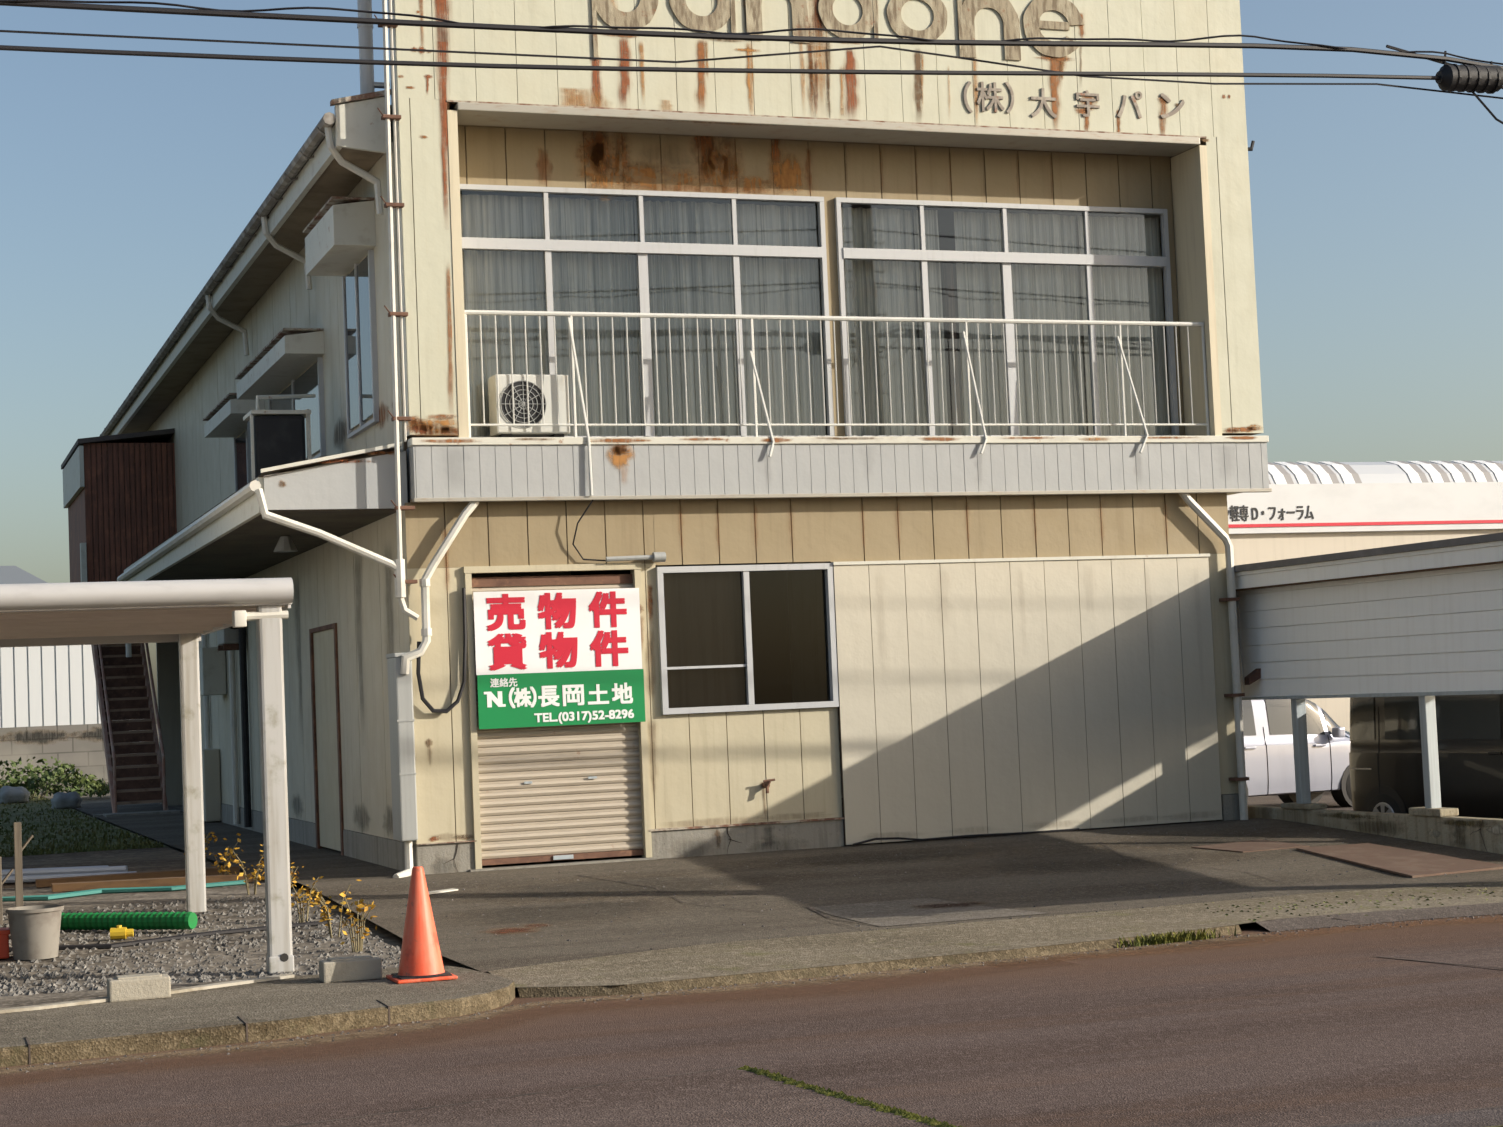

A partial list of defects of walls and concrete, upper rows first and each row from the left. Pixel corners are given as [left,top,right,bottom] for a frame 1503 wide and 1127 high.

corrosion [398,0,449,205]
corrosion [564,60,601,106]
corrosion [580,35,811,193]
corrosion [800,0,857,111]
corrosion [915,53,923,112]
corrosion [1041,56,1082,121]
corrosion [1076,96,1092,130]
corrosion [408,414,473,443]
corrosion [591,438,650,468]